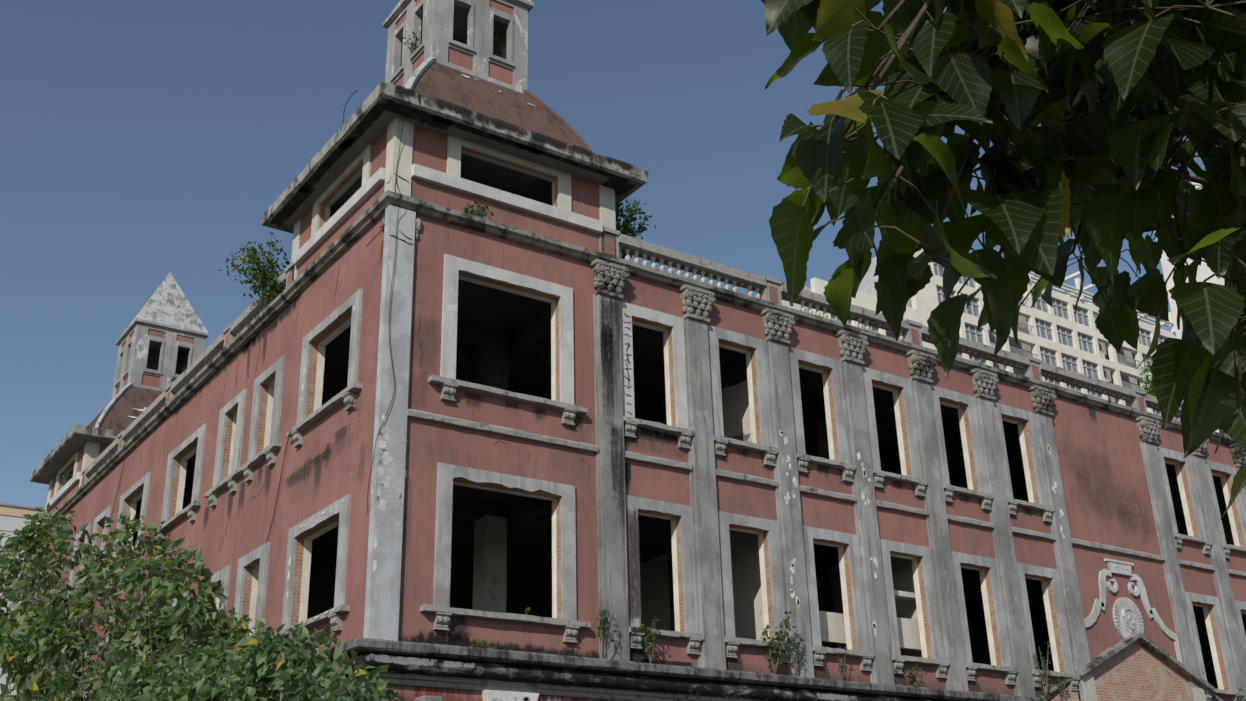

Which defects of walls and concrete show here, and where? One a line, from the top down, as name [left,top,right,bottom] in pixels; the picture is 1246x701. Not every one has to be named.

leakage [227,465,271,513]
leakage [288,426,347,486]
peeling [377,415,402,513]
peeling [780,430,797,504]
peeling [790,558,801,608]
leakage [630,627,692,667]
leakage [727,659,743,671]
leakage [814,667,830,679]